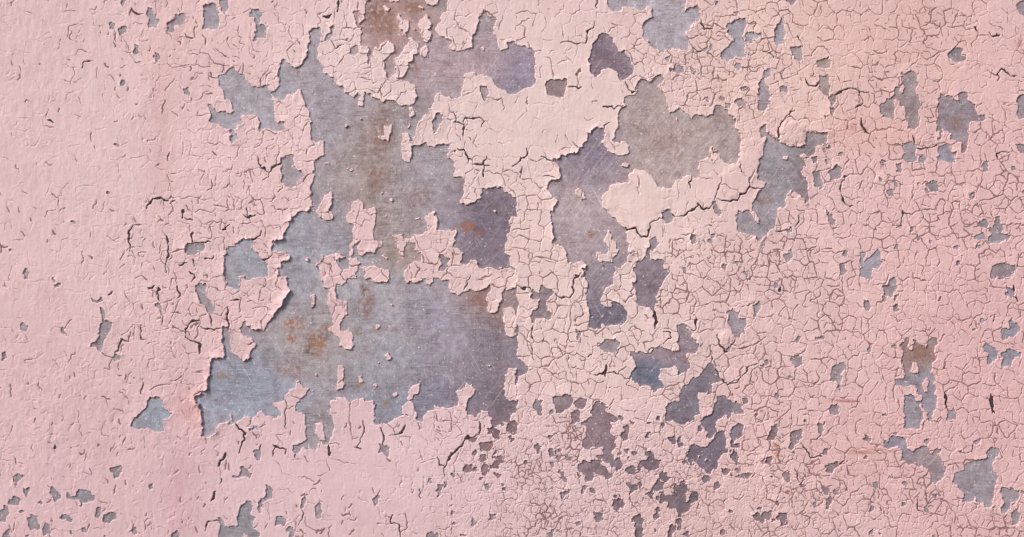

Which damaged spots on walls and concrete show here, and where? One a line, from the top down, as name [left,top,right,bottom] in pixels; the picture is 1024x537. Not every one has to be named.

peeling [185,241,205,255]
crack [0,0,416,537]
peeling [195,0,568,498]
peeling [524,0,805,537]
crack [380,0,1024,537]
peeling [736,124,843,241]
peeling [879,70,986,196]
peeling [131,397,172,432]
peeling [884,337,1024,525]